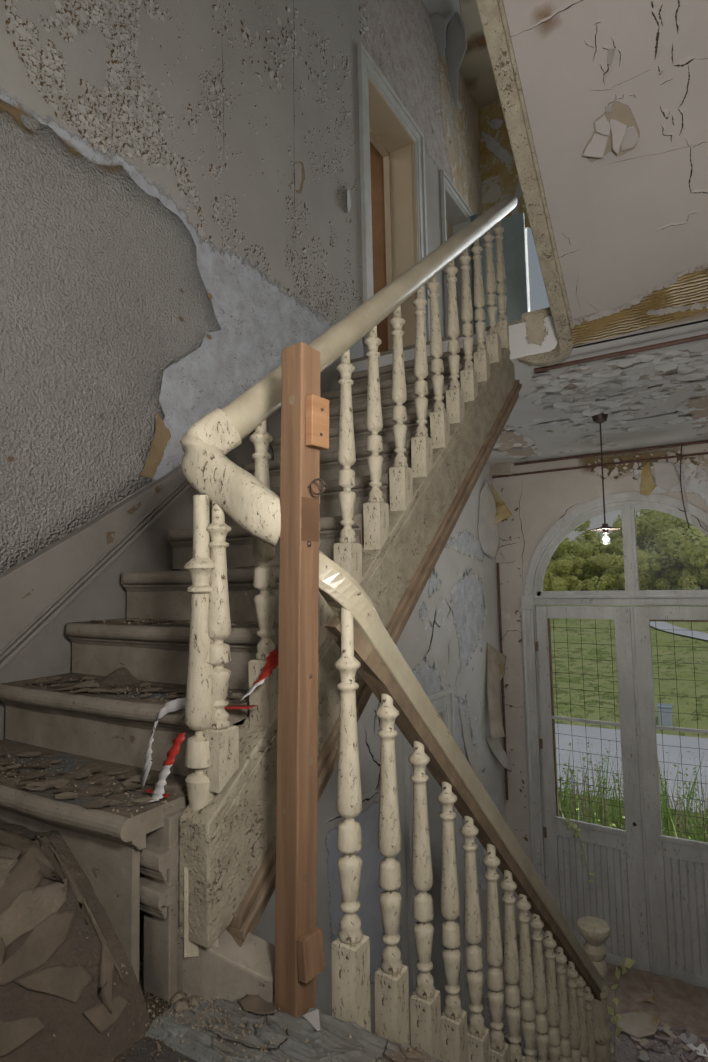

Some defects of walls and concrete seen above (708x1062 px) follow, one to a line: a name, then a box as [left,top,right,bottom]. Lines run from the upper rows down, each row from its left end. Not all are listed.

peeling [358,0,514,217]
crack [510,0,708,231]
flaking render [583,102,640,162]
flaking render [0,0,361,493]
peeling [492,349,708,506]
flaking render [412,654,479,768]
flaking render [475,836,487,891]